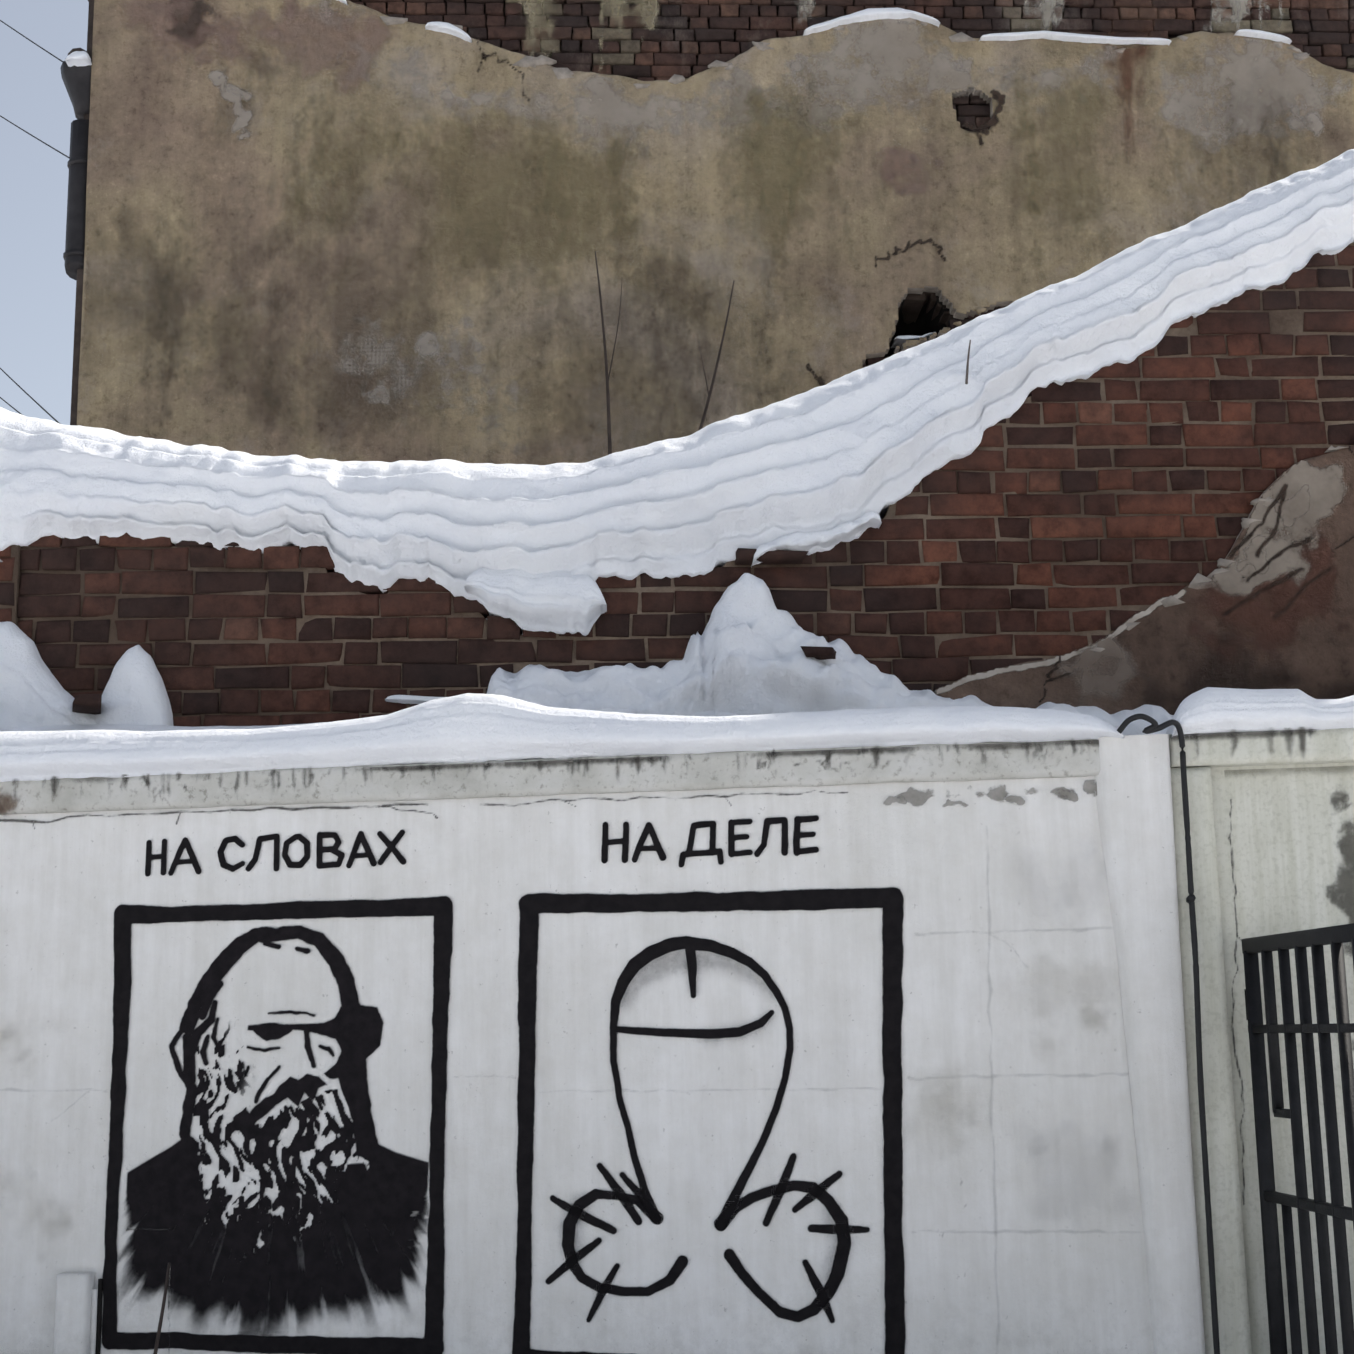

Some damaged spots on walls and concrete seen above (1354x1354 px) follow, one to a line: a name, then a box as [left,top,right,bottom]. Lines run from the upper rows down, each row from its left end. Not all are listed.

flaking render [349,0,1354,145]
crack [875,238,946,267]
spalling [863,294,1007,368]
crack [806,364,825,386]